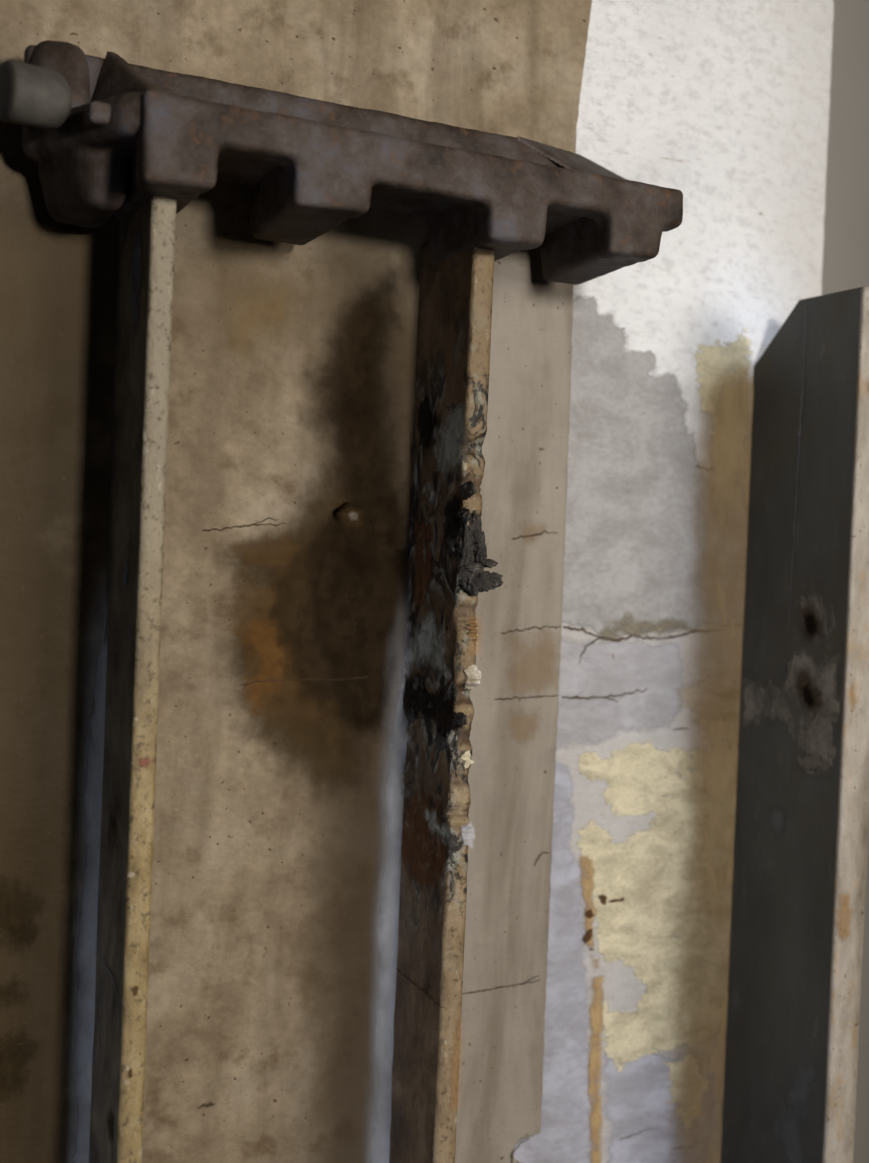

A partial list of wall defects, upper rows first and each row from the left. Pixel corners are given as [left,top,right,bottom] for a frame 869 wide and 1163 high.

crack [203,517,286,532]
water stain [235,464,379,783]
crack [502,626,708,663]
peeling [464,664,482,689]
crack [495,688,648,703]
water stain [743,650,840,774]
peeling [460,750,475,769]
rust [401,794,449,885]
peeling [577,741,704,1116]